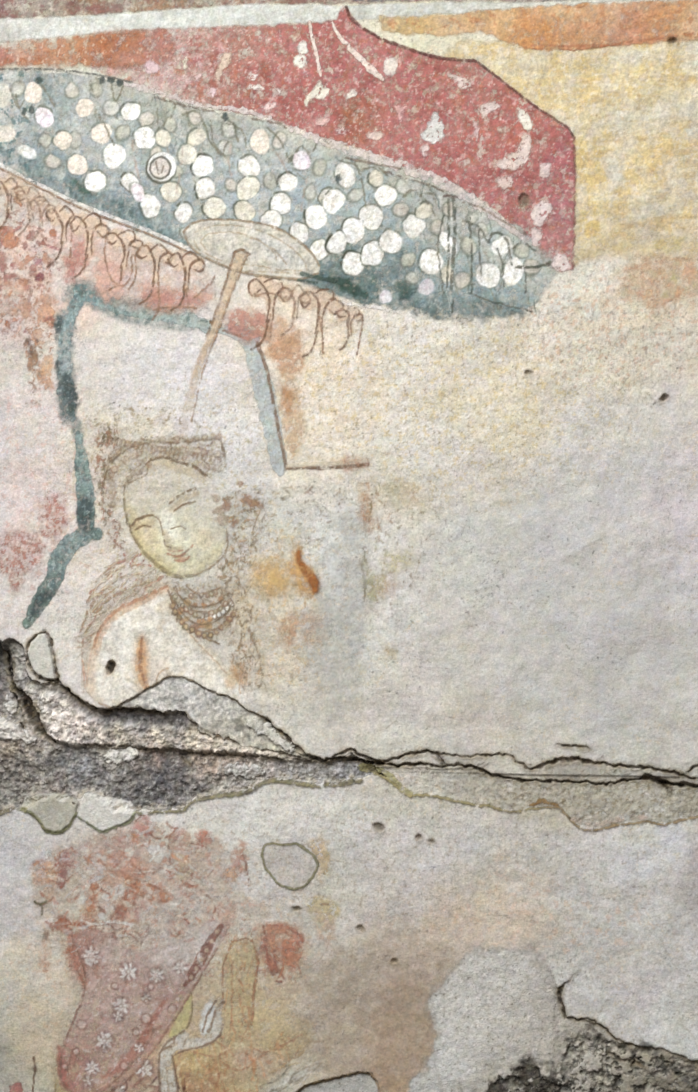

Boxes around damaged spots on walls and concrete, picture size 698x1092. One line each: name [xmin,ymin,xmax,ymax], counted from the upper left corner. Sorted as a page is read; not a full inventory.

crack [6,632,164,743]
spalling [0,633,382,834]
flaking render [469,763,698,829]
spalling [408,946,698,1092]
spalling [296,1071,379,1092]